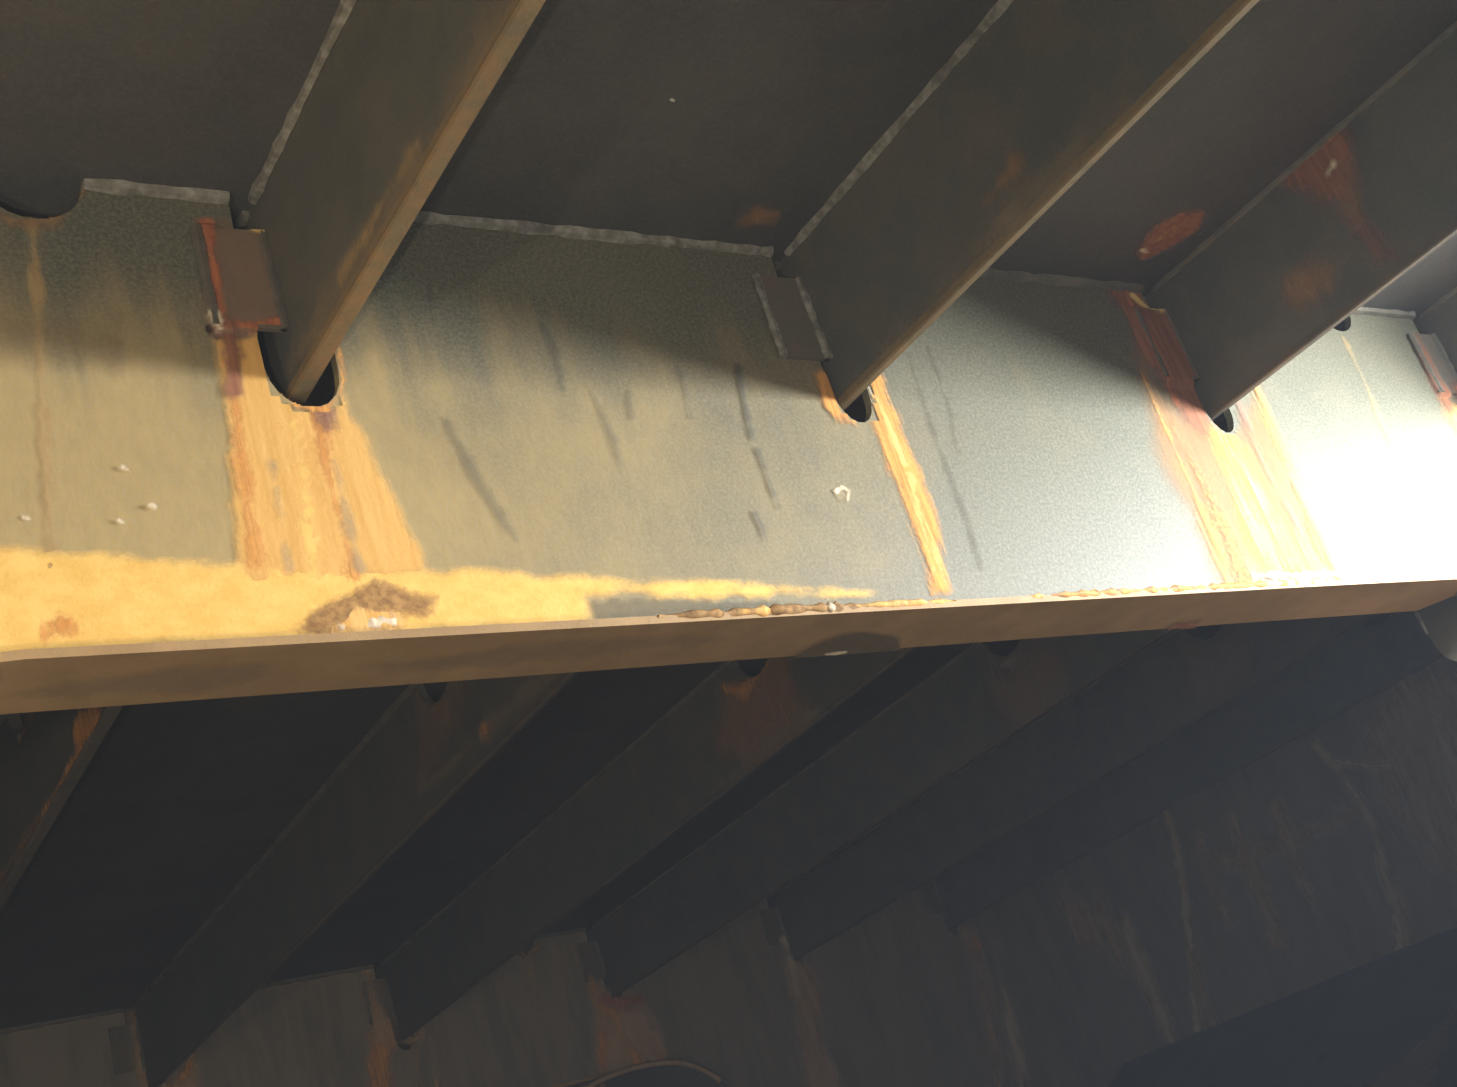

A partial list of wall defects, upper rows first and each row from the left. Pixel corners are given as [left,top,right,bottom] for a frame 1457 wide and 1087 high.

rust [1138,211,1204,259]
rust [199,218,425,581]
rust [657,370,956,619]
rust [1030,290,1342,599]
rust [1415,336,1457,433]